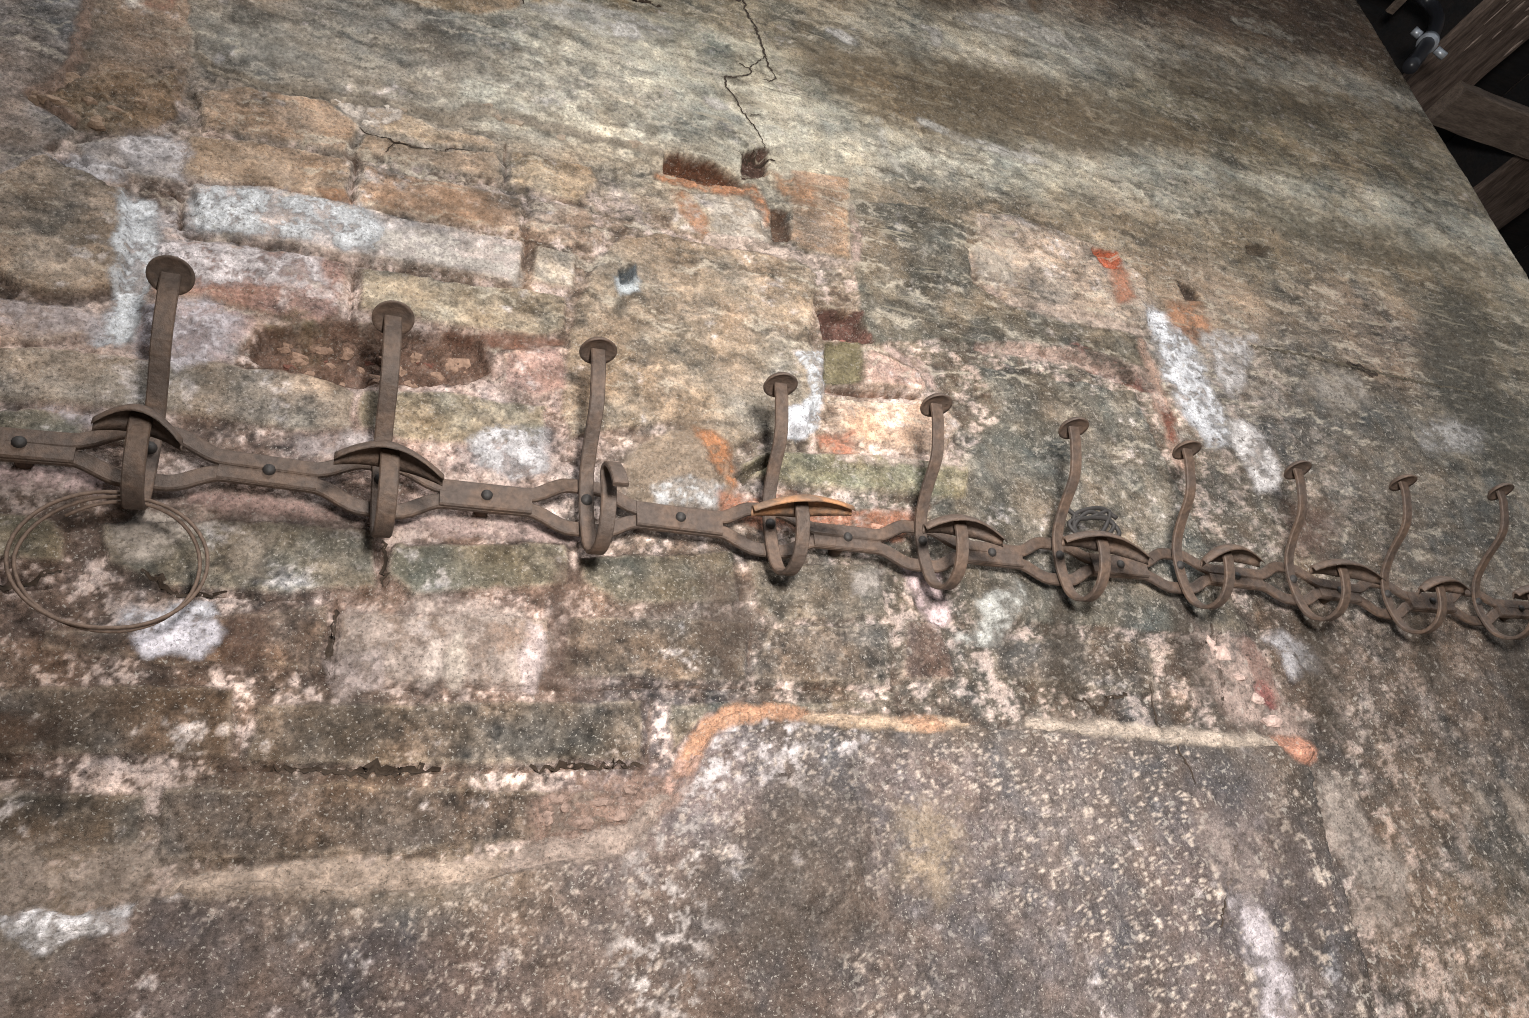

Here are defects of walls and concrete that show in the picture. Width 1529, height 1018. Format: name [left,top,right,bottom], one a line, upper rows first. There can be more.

crack [724,0,777,168]
spalling [254,320,383,389]
spalling [398,339,489,388]
water stain [975,248,1280,491]
water stain [842,454,925,466]